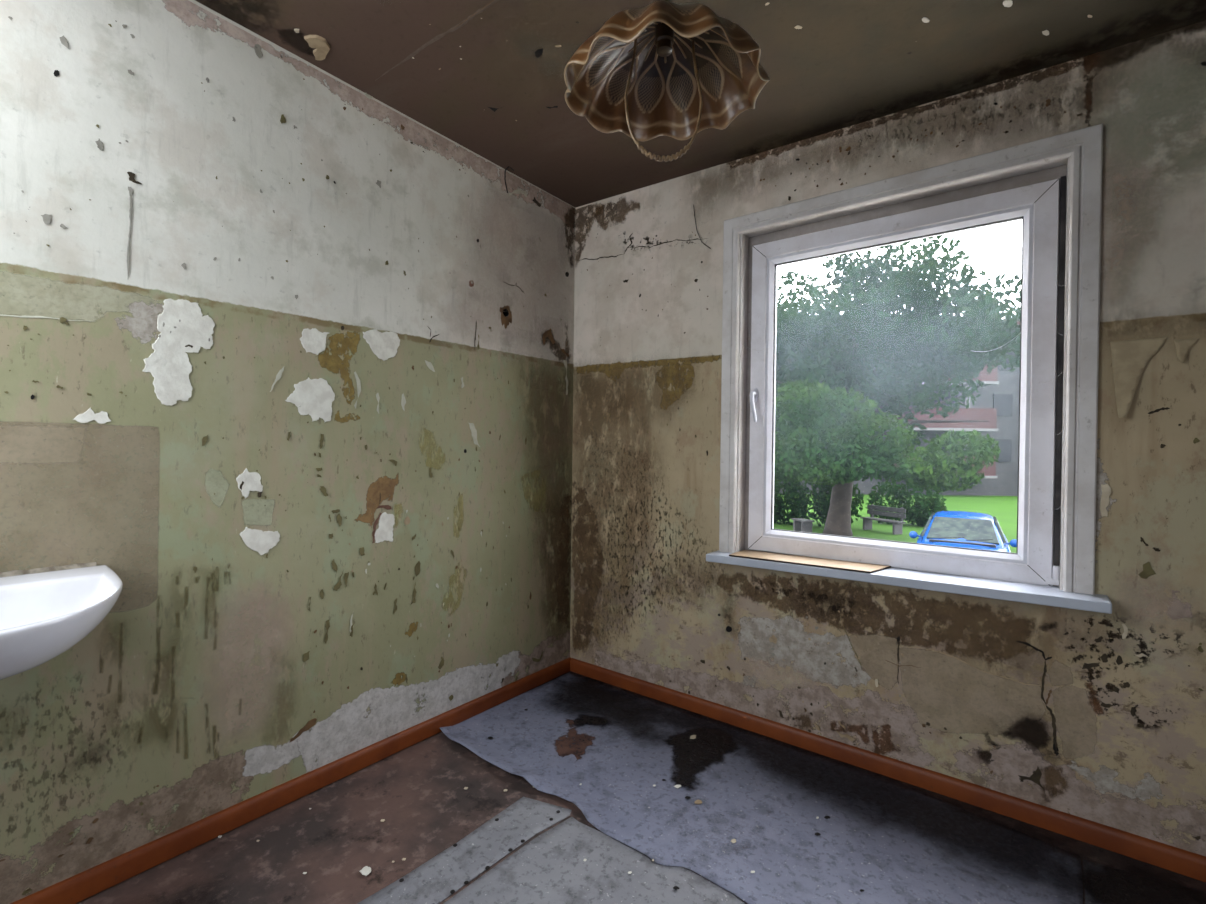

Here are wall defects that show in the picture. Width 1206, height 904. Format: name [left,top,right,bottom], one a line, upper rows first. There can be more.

peeling [162,0,575,242]
leakage [727,0,1206,169]
peeling [25,207,67,229]
leakage [565,198,640,266]
crack [578,234,706,283]
peeling [0,630,570,904]
peeling [303,620,330,662]
leakage [554,482,605,649]
leakage [551,675,1206,904]
peeling [595,609,1206,856]
crack [1016,641,1059,756]
peeling [1138,538,1160,579]